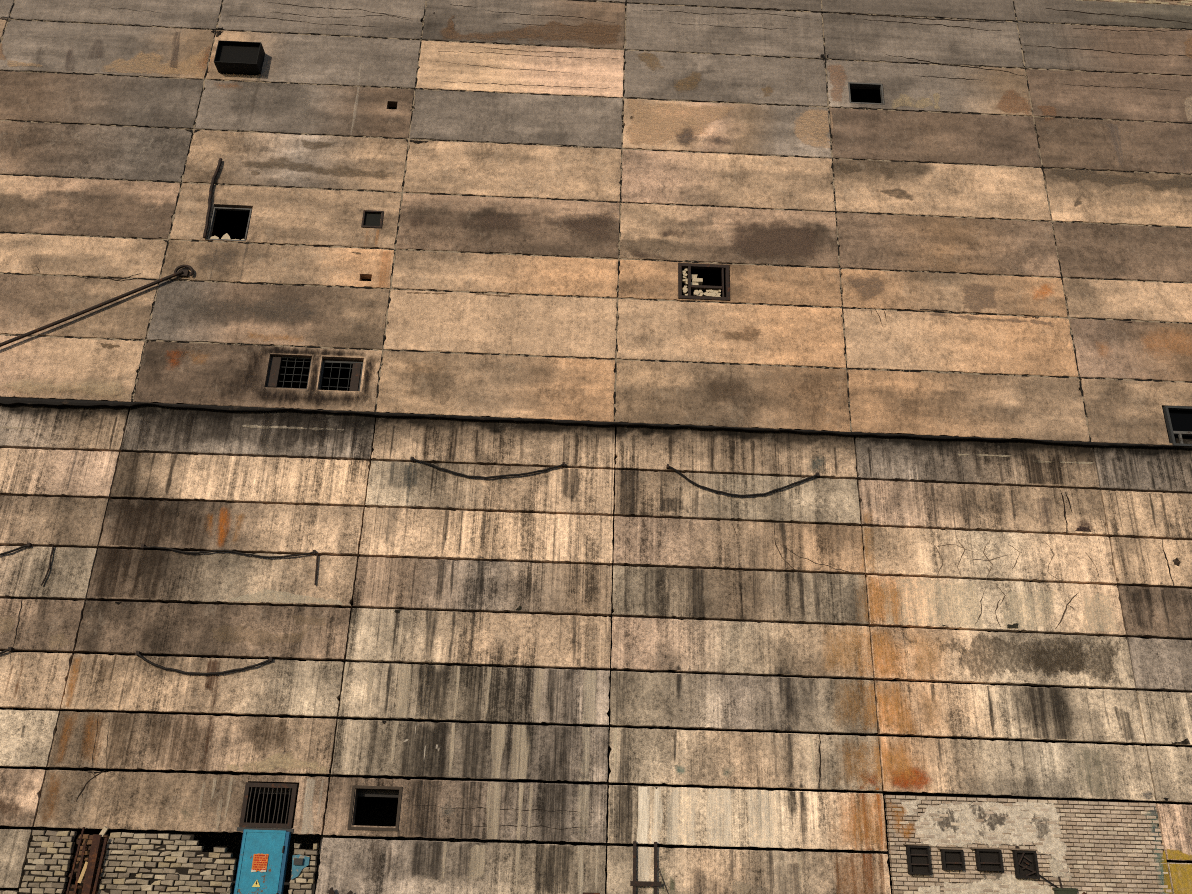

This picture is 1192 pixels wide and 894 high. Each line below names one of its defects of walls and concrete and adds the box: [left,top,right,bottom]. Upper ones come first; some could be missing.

crack [929,490,1100,629]
damp [918,583,1118,739]
damp [385,612,597,894]
rust [861,748,928,841]
peeling [901,799,1072,894]